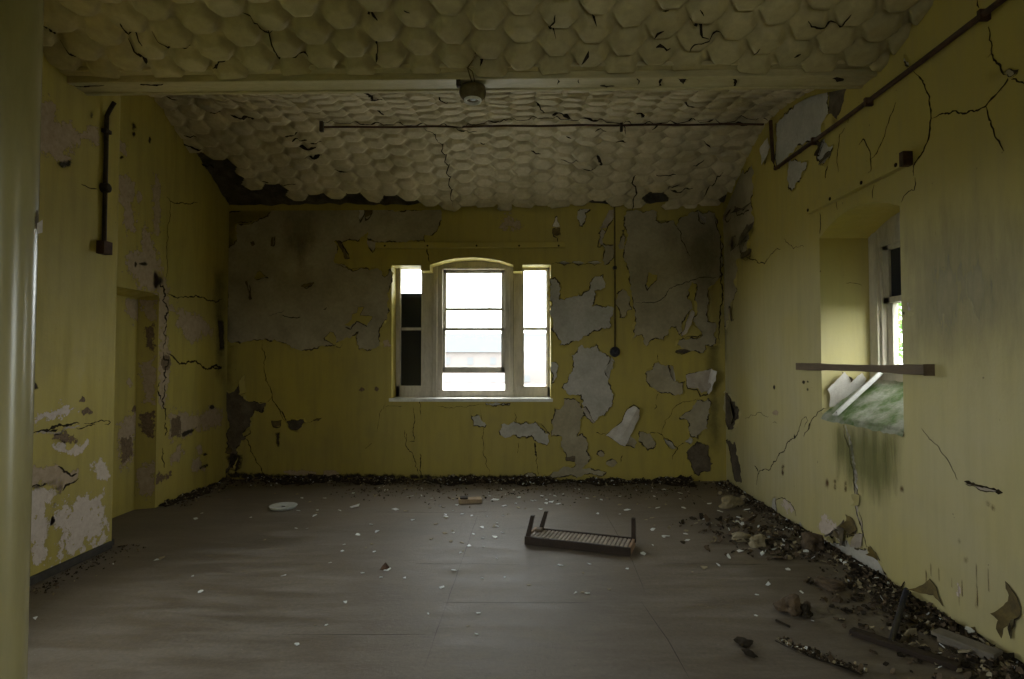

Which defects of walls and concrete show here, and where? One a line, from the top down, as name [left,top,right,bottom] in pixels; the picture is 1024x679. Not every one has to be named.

crack [120,24,190,100]
peeling [227,209,444,352]
crack [285,93,767,210]
crack [557,51,613,88]
crack [654,10,724,51]
peeling [722,92,835,330]
crack [808,14,852,30]
crack [902,0,1024,200]
spalling [31,224,321,568]
peeling [470,274,632,479]
peeling [644,360,742,483]
crack [747,408,867,548]